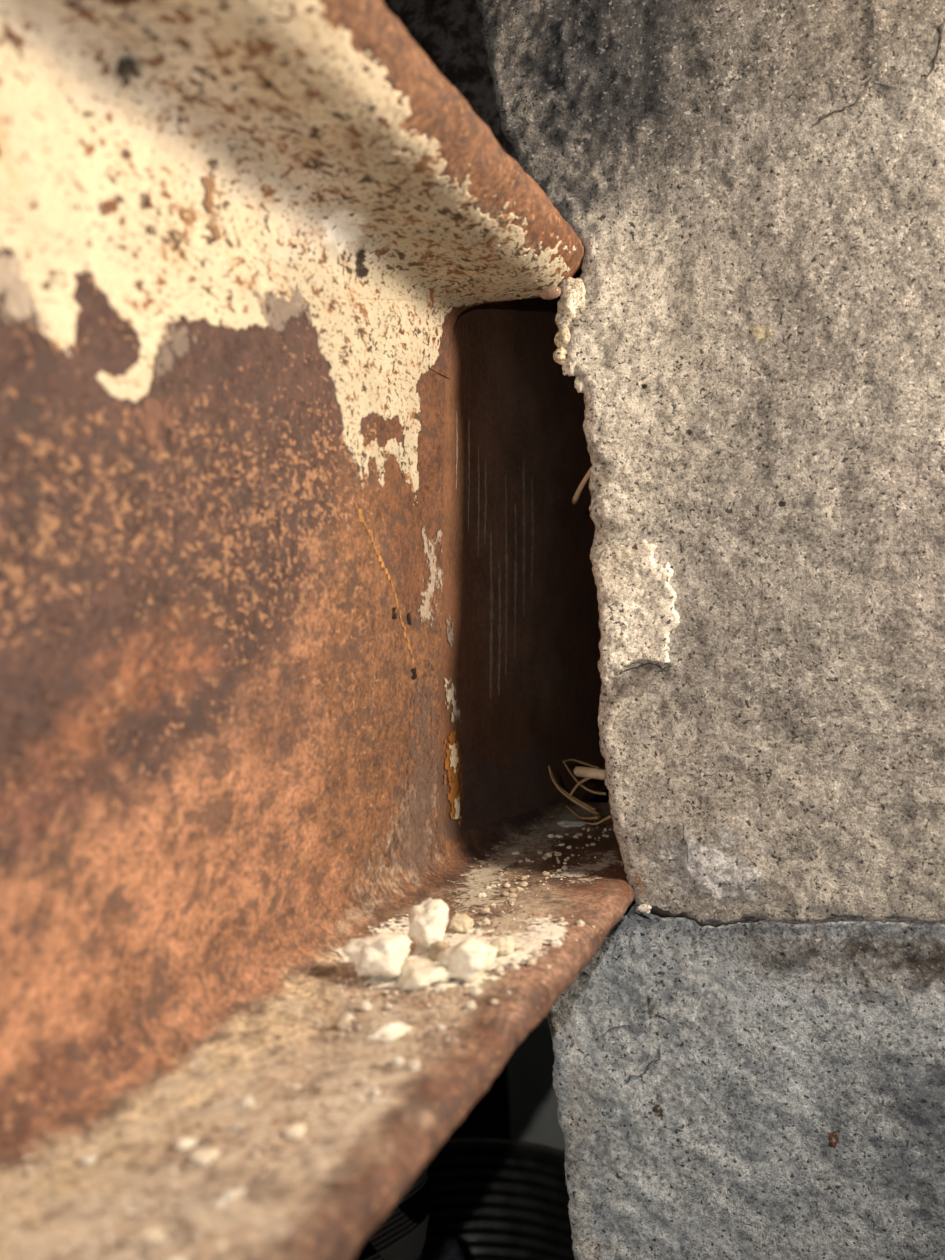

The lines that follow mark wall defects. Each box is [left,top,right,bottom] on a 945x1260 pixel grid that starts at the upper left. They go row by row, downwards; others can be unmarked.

peeling [0,0,576,505]
corrosion [127,398,177,450]
corrosion [354,501,414,666]
corrosion [443,731,465,826]